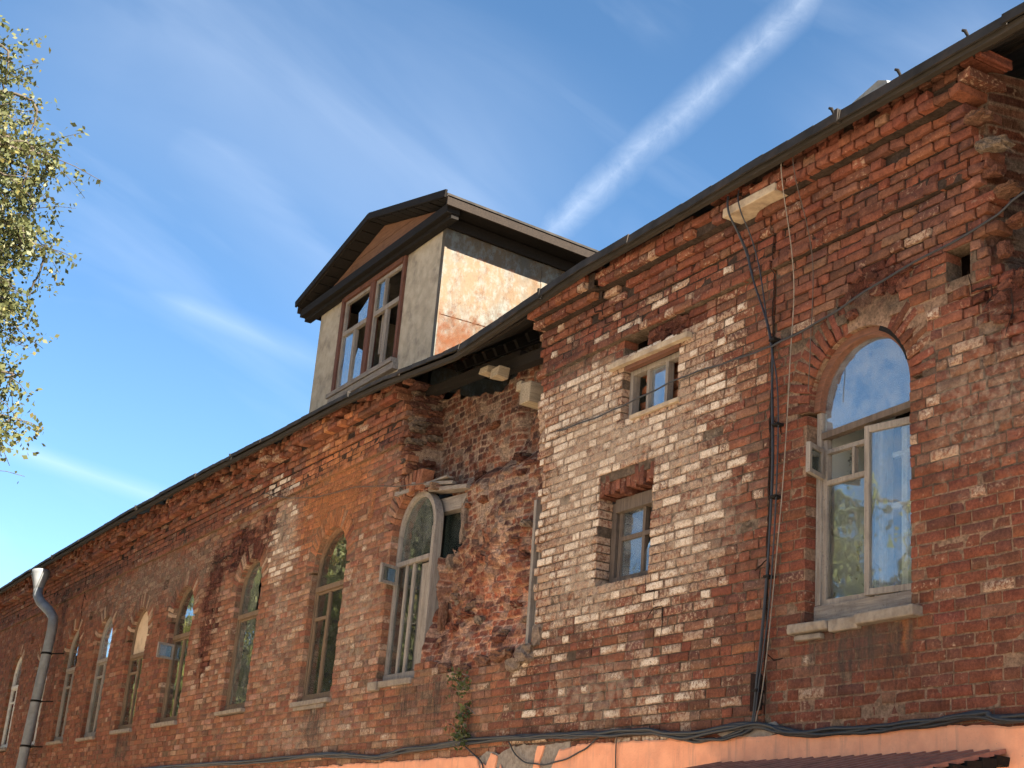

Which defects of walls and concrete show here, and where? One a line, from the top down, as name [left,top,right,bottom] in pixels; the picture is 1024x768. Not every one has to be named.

spalling [394,281,751,727]